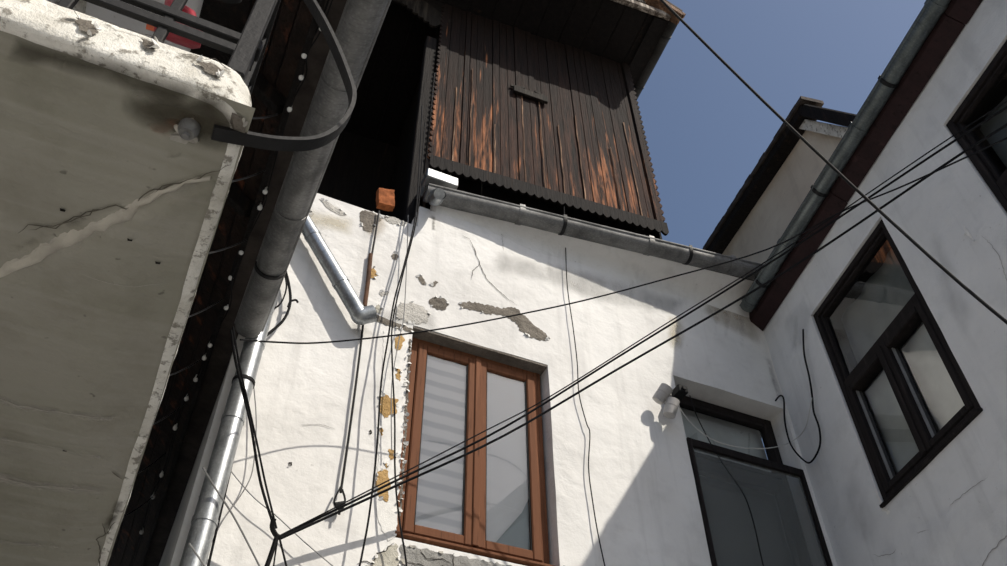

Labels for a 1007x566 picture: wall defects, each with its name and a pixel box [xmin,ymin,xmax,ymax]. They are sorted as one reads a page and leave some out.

peeling [74,10,102,36]
peeling [141,37,160,49]
peeling [196,55,225,77]
crack [19,164,231,233]
spalling [320,198,347,215]
spalling [360,210,407,232]
crack [466,237,514,303]
peeling [369,274,551,566]